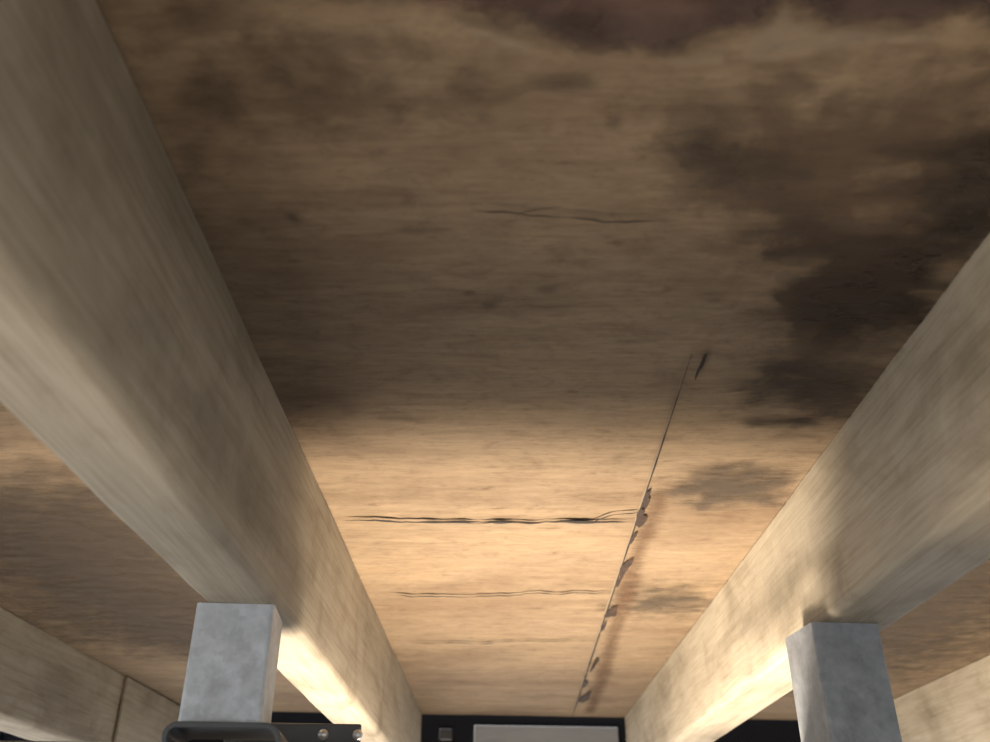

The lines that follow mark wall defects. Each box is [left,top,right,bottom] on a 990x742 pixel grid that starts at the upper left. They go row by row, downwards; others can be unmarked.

damp [420,0,990,56]
crack [471,206,669,223]
damp [766,134,990,348]
damp [667,466,791,511]
crack [343,353,707,716]